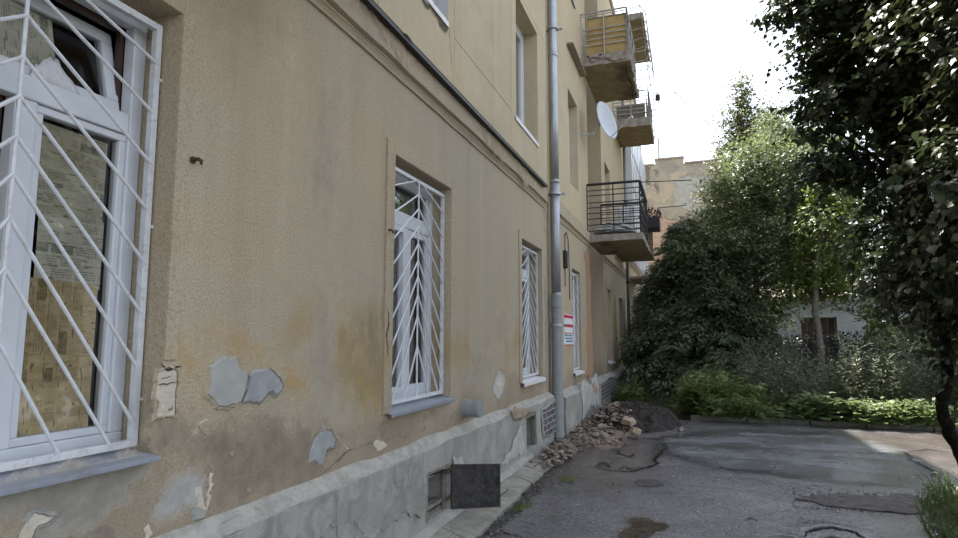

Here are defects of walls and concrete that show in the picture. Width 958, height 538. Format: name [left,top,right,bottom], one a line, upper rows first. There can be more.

flaking render [151,364,181,422]
peeling [493,368,505,398]
flaking render [19,508,58,538]